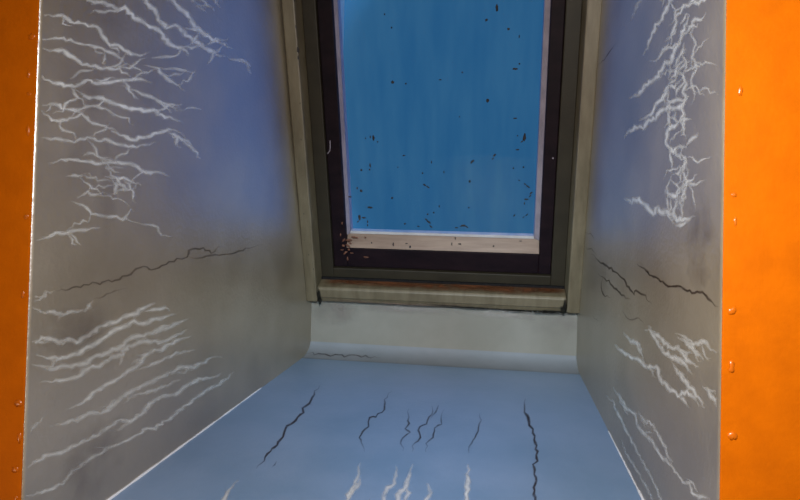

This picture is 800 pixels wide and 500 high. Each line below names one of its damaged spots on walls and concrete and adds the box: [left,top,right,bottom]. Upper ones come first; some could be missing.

water stain [45,0,226,174]
water stain [626,0,709,227]
water stain [50,205,125,242]
crack [646,270,711,301]
water stain [40,307,163,369]
water stain [620,331,714,402]
water stain [113,384,220,447]
crack [264,398,312,460]
crack [524,410,539,500]
water stain [614,396,704,500]
water stain [383,475,410,500]